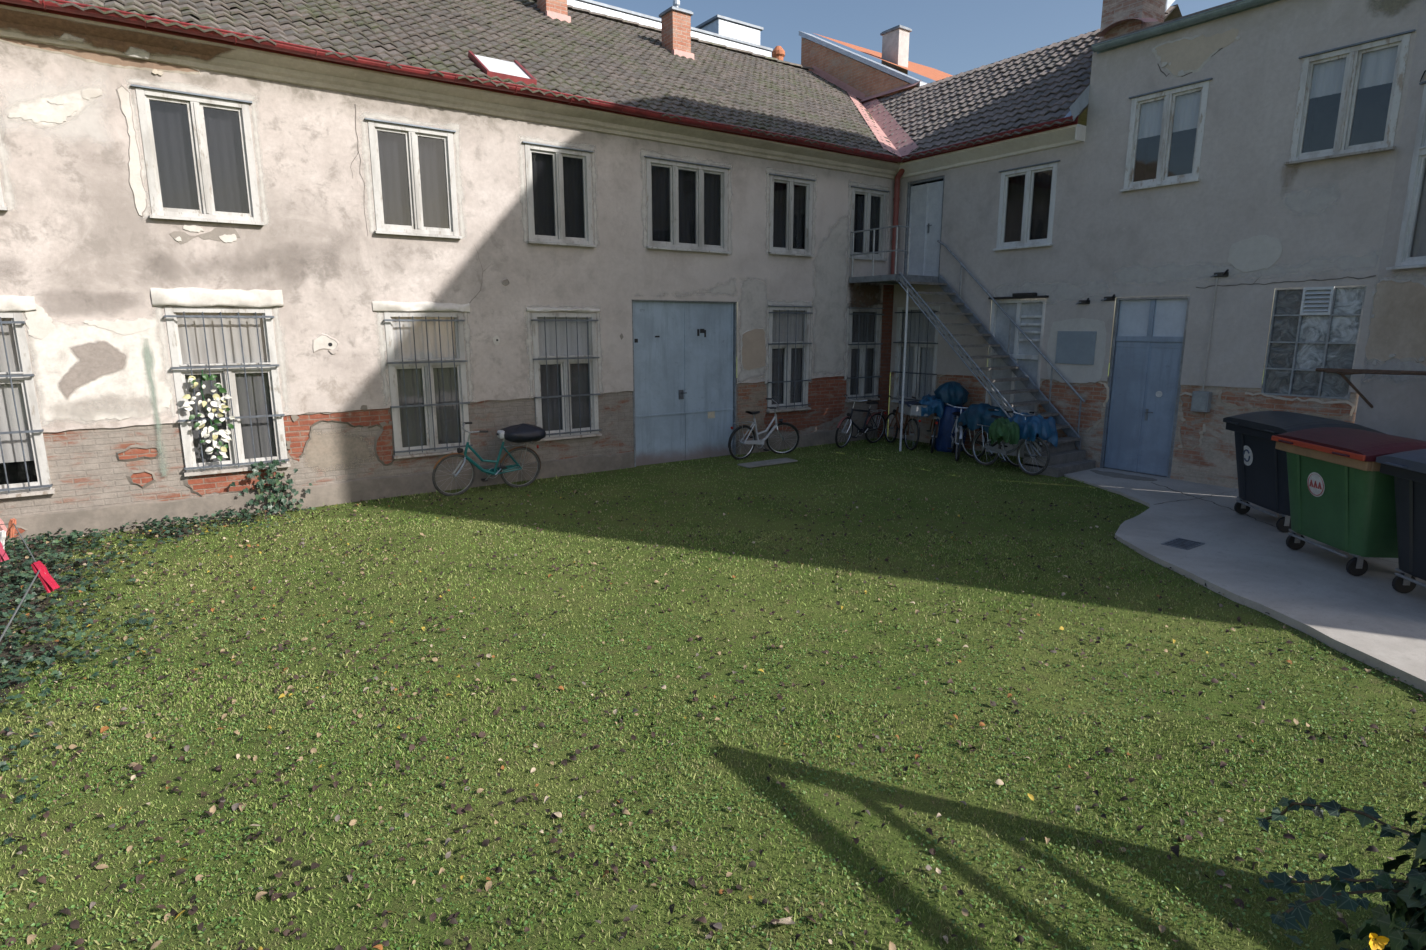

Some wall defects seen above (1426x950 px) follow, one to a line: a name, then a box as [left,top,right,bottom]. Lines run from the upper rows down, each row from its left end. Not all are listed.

spalling [59,318,151,398]
flaking render [1218,391,1355,419]
flaking render [283,405,395,466]
flaking render [116,444,162,489]
flaking render [183,469,281,497]